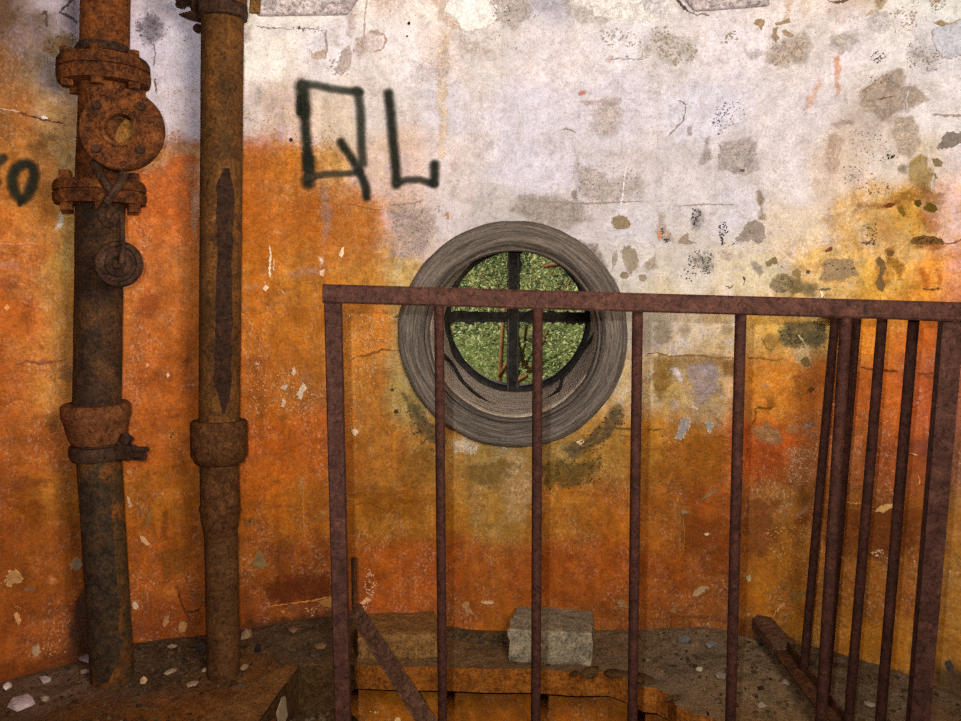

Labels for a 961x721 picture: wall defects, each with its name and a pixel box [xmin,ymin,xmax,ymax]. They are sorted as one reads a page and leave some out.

peeling [749,18,804,66]
spalling [931,19,961,60]
corrosion [128,74,198,219]
peeling [718,140,759,175]
peeling [861,69,961,189]
spalling [611,214,632,231]
spalling [719,191,768,260]
spalling [751,247,860,283]
corrosion [874,248,902,291]